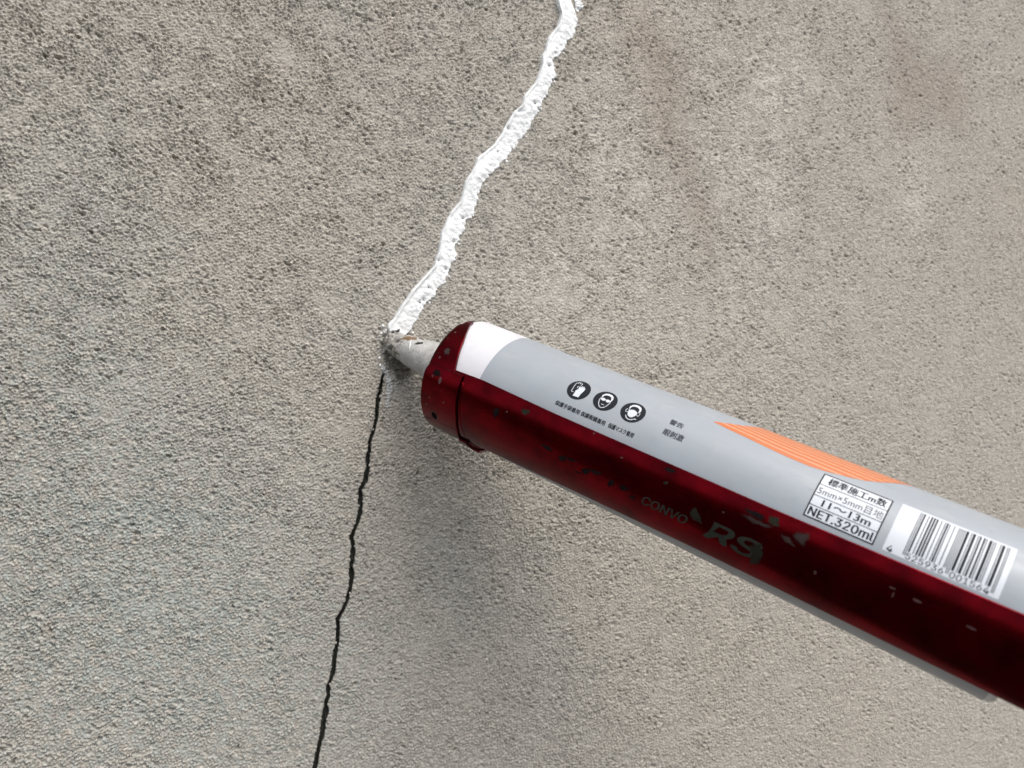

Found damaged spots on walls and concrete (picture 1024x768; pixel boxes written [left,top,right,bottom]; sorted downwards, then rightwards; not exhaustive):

crack [313,373,385,768]